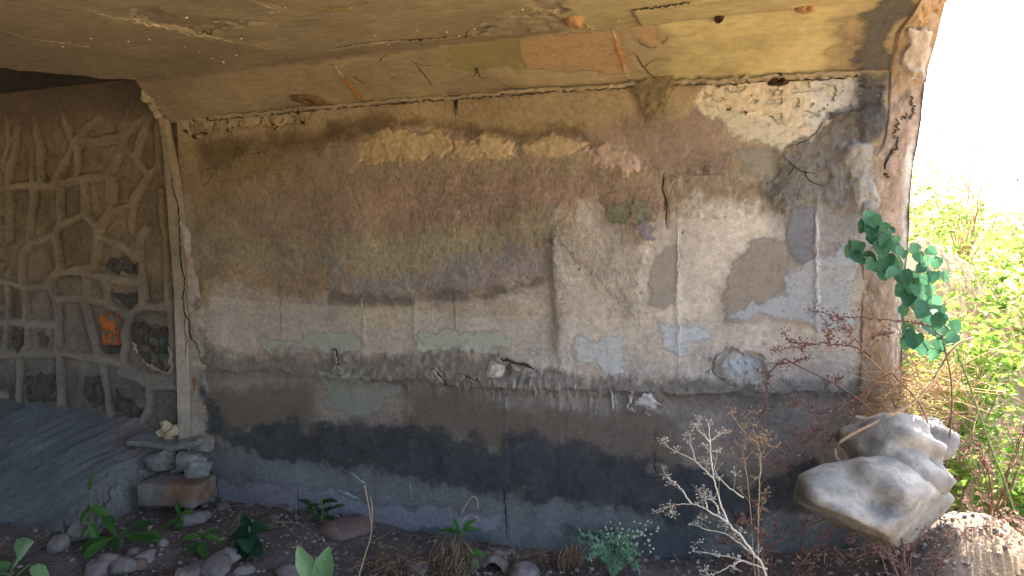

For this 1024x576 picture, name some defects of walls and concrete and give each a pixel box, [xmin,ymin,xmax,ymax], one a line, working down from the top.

crack [633,1,693,11]
crack [784,122,825,187]
damp [596,192,656,241]
crack [661,173,669,229]
crack [171,178,202,363]
damp [328,291,412,306]
spalling [428,352,543,386]
peeling [625,391,665,416]
damp [199,369,819,560]